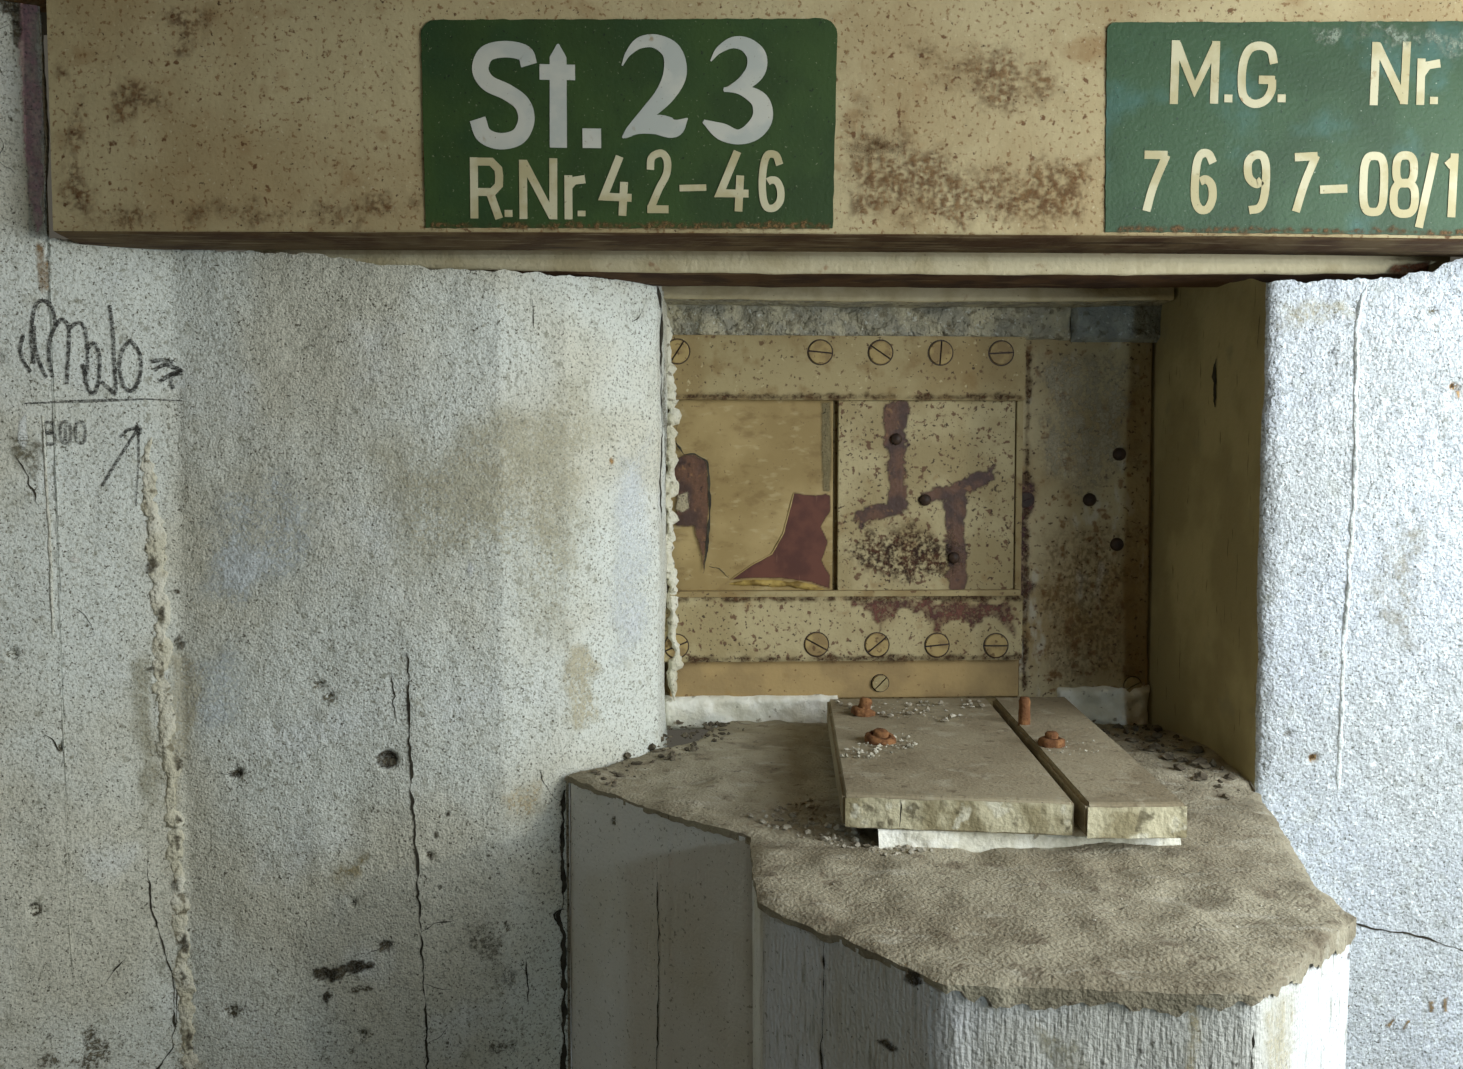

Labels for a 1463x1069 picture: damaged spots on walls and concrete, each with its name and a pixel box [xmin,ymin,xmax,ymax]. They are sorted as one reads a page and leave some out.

rust [853,400,998,590]
crack [391,653,454,1069]
spalling [904,969,922,986]
crack [1356,923,1463,951]